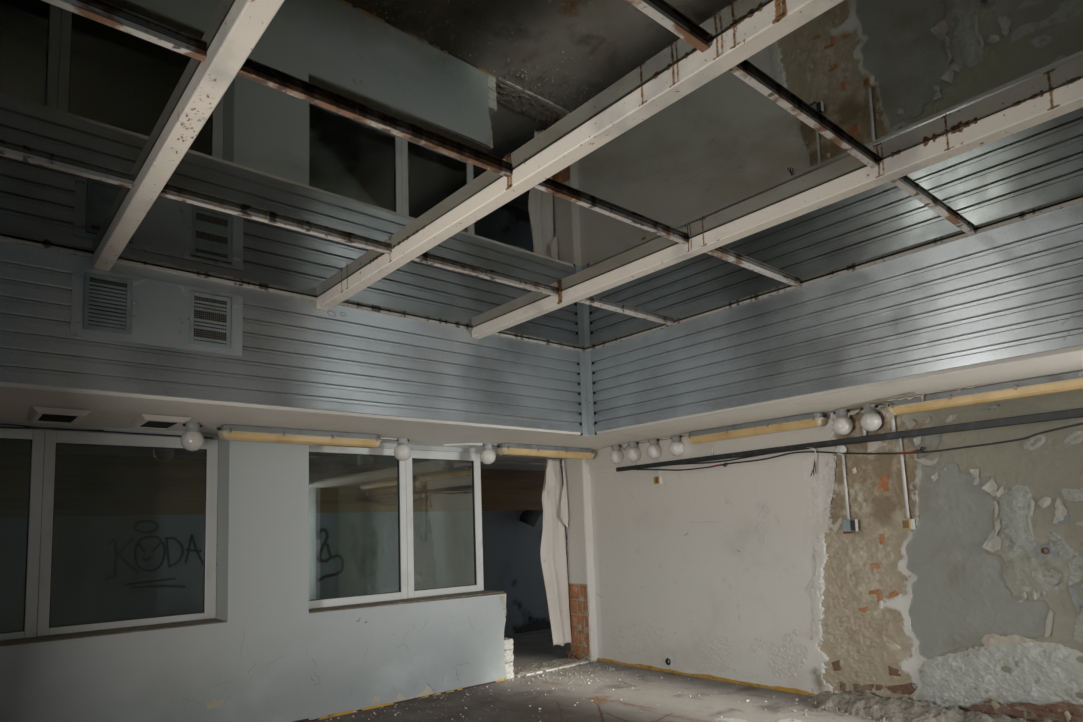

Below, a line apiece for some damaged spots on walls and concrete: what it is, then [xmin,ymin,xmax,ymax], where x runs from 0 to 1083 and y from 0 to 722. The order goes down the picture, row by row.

rust [772,0,786,24]
spalling [807,392,1083,722]
flaking render [567,583,591,660]